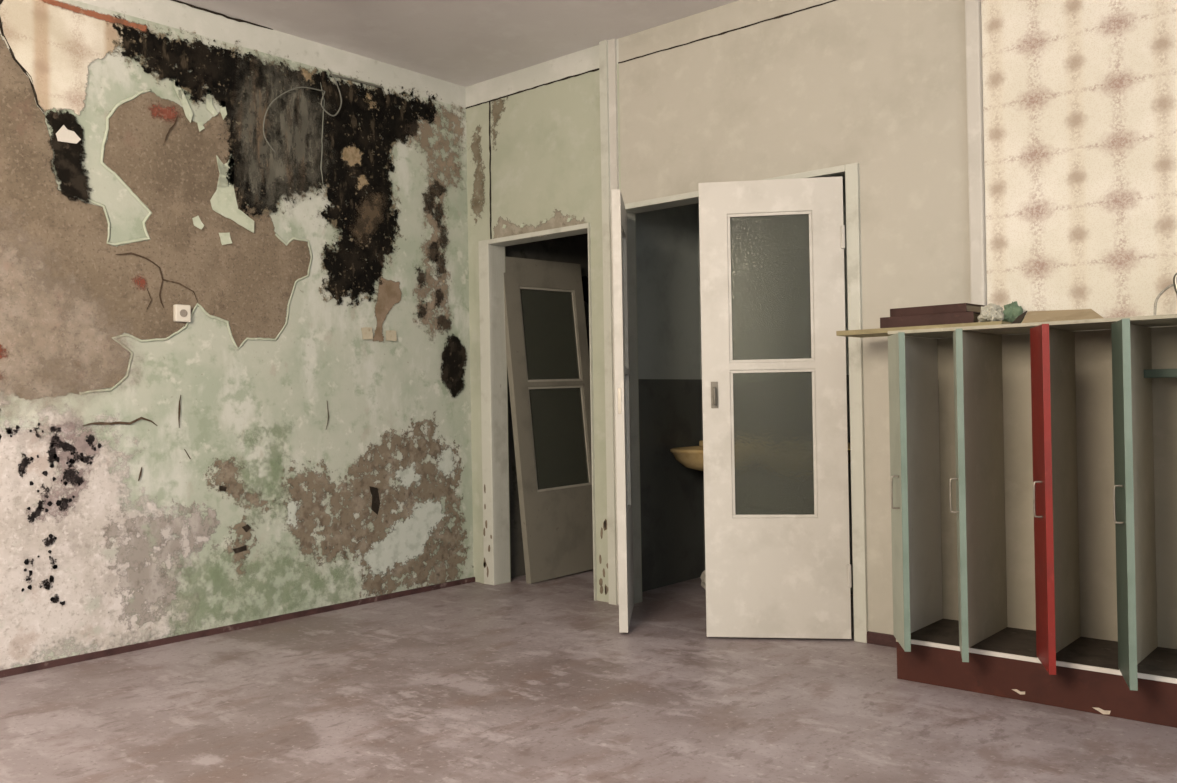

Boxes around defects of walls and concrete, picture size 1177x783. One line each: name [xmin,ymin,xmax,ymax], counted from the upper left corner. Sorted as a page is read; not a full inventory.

flaking render [0,0,469,671]
damp [109,15,508,398]
peeling [493,209,585,239]